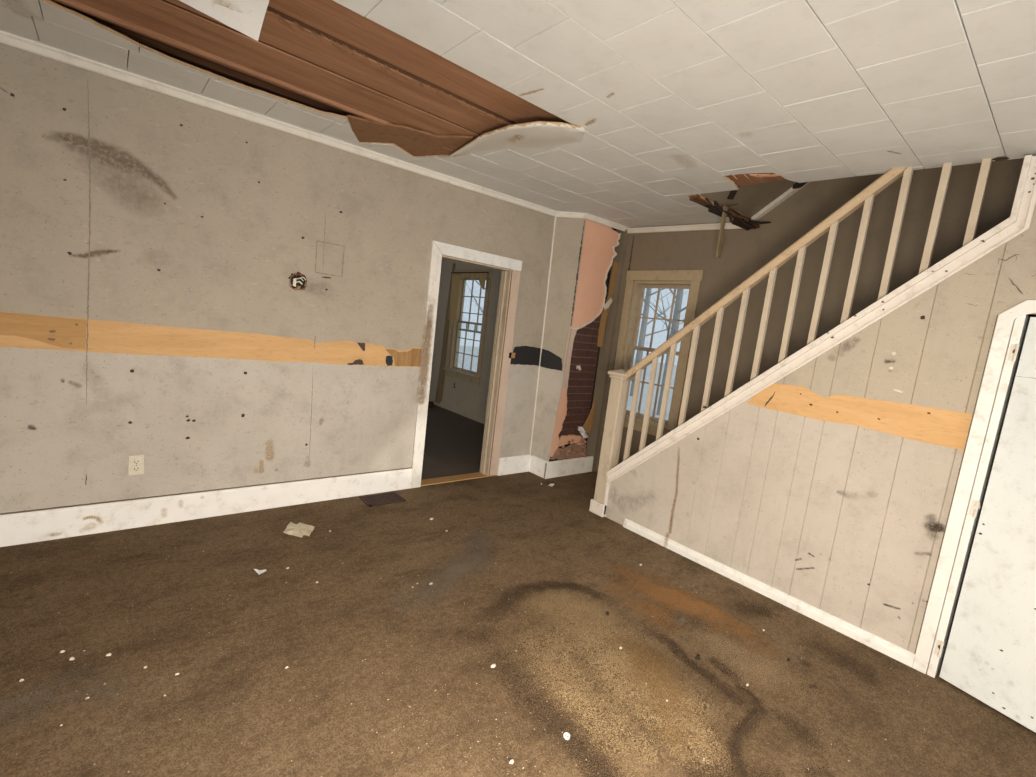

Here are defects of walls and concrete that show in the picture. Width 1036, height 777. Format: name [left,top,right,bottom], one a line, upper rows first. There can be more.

flaking render [558,233,621,441]